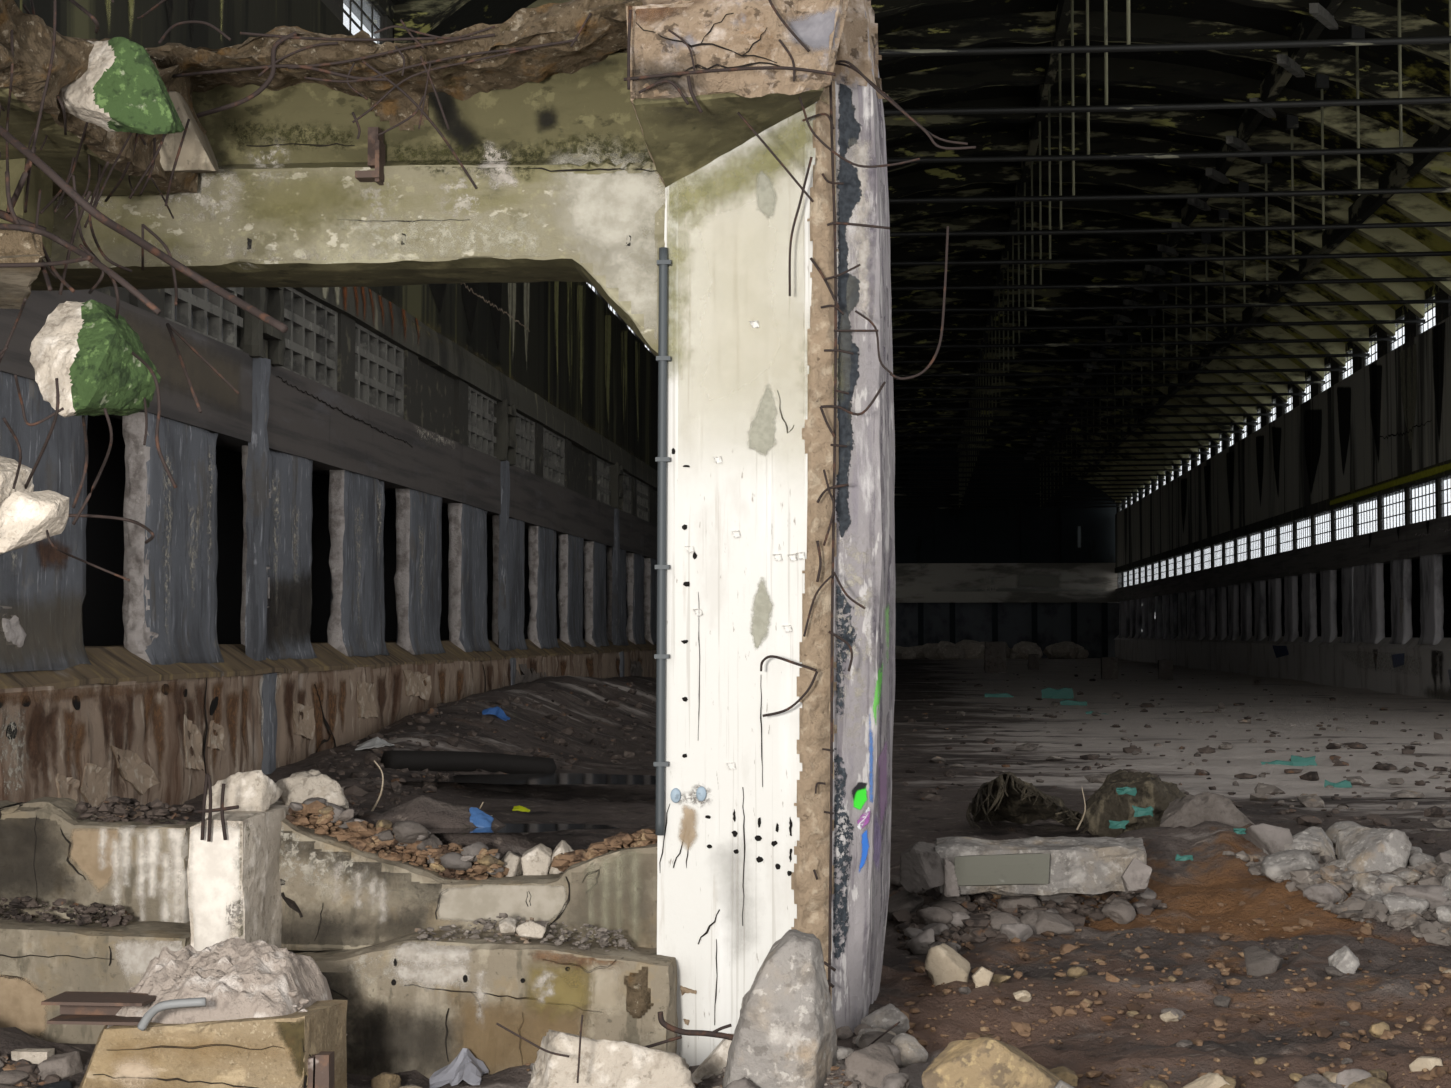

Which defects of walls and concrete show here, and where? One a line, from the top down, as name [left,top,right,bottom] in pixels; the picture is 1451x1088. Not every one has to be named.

water stain [428,92,479,151]
spalling [0,0,591,413]
spalling [3,374,64,489]
spalling [46,352,177,654]
spalling [624,0,976,1001]
spalling [1,606,26,647]
rust [0,684,248,790]
rust [284,680,346,752]
rust [378,674,399,724]
rust [423,671,464,703]